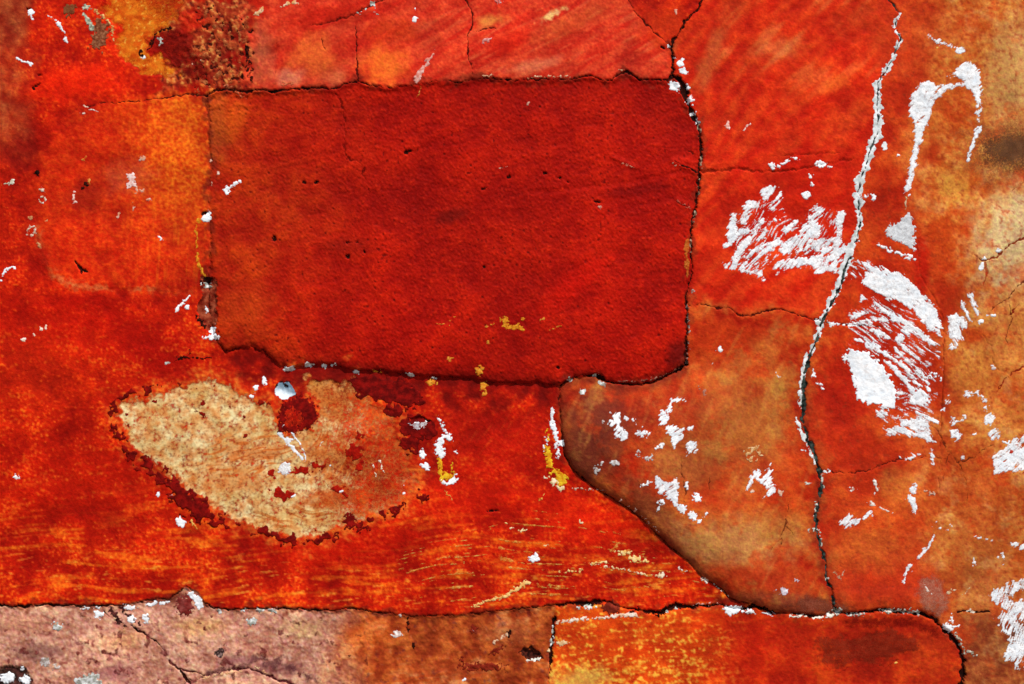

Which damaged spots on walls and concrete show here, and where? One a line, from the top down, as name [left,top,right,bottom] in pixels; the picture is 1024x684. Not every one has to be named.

crack [72,0,412,121]
peeling [760,185,782,210]
peeling [848,260,944,339]
crack [220,345,510,396]
crack [430,0,991,684]
peeling [108,369,445,549]
peeling [624,397,686,438]
peeling [686,426,698,454]
peeling [677,481,708,524]
peeling [405,511,670,608]
crack [0,588,446,684]